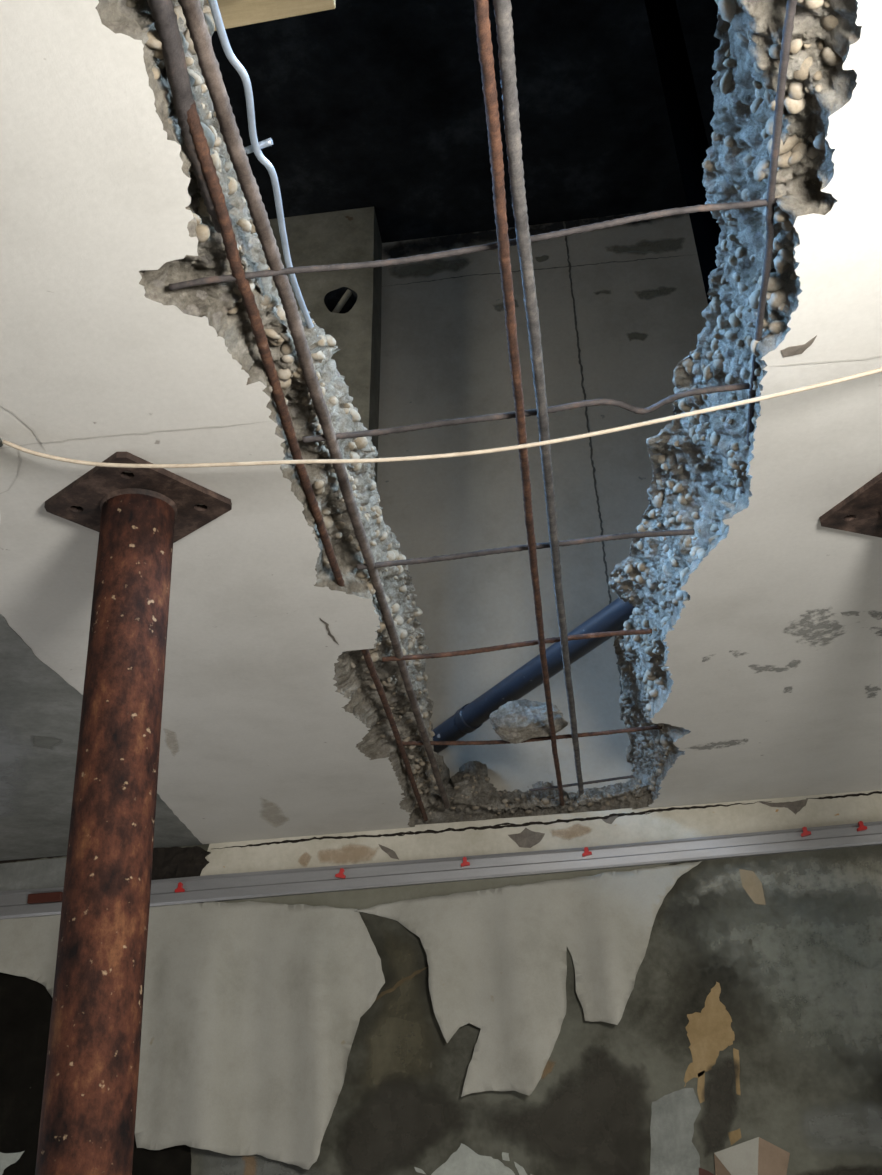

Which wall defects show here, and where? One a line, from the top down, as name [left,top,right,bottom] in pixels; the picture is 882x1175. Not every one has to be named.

spalling [96,0,862,848]
crack [806,791,882,799]
crack [214,801,772,849]
peeling [701,857,882,1066]
peeling [0,972,53,1175]
peeling [684,982,741,1153]
leakage [805,1106,882,1152]
peeling [132,1135,192,1175]
peeling [502,1152,532,1175]
leakage [806,1167,882,1175]